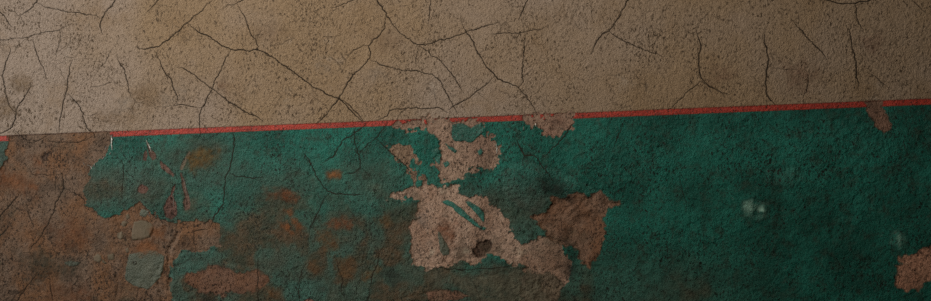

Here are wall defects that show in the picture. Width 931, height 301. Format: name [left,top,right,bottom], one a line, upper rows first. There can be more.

crack [591,0,661,56]
crack [668,31,729,110]
crack [764,34,774,103]
crack [828,0,885,91]
crack [138,0,548,263]
peeling [0,131,221,301]
peeling [386,109,621,301]